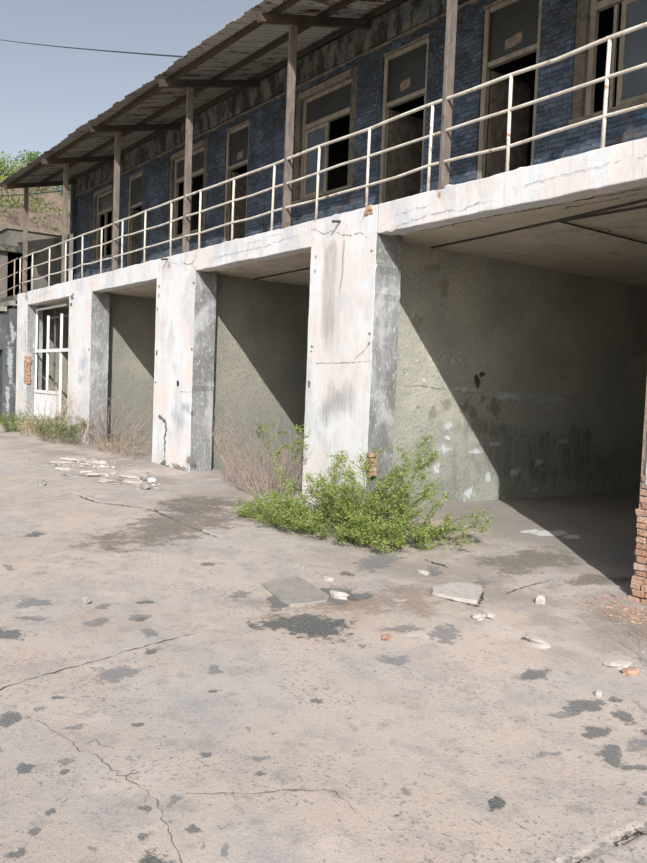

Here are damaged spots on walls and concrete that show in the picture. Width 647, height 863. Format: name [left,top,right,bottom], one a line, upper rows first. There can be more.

crack [388,188,643,233]
flaking render [627,470,647,605]